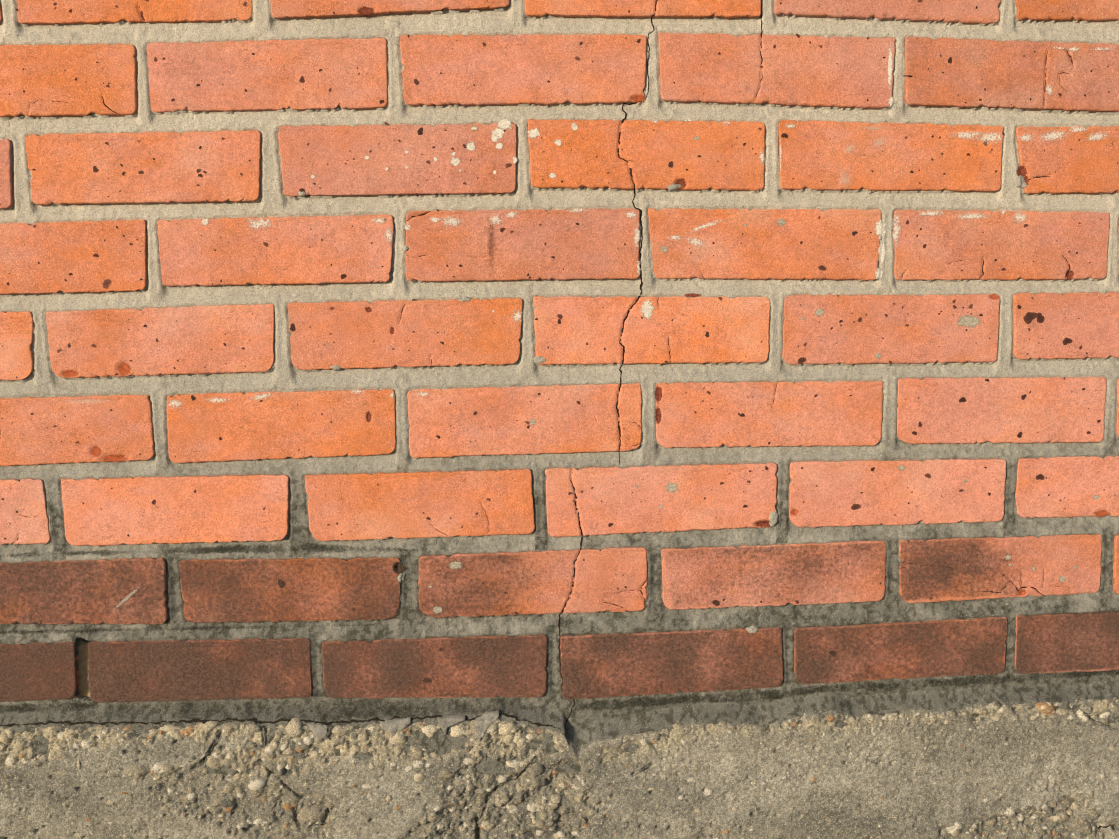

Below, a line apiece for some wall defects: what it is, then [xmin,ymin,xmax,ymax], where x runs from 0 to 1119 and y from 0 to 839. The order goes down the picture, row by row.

crack [616,0,660,463]
water stain [0,543,547,719]
water stain [725,544,884,596]
water stain [561,611,1119,709]
water stain [901,541,1008,600]
spalling [0,709,596,839]